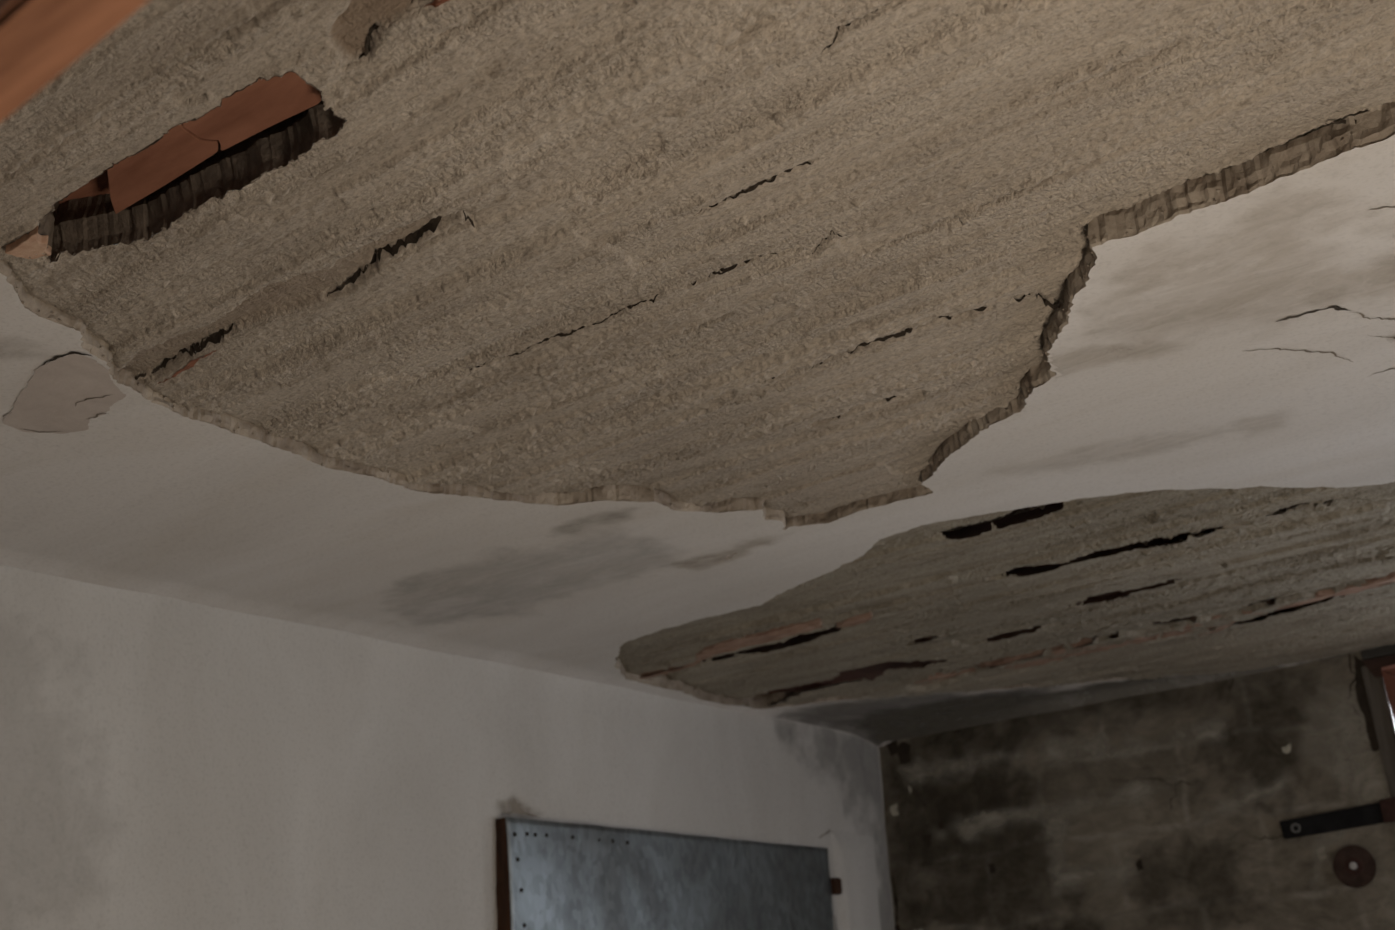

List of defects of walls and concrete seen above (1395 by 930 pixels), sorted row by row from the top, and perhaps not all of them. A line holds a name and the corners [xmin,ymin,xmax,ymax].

flaking render [0,0,1395,530]
crack [1245,305,1395,377]
crack [947,503,1052,532]
flaking render [614,482,1395,751]
leakage [801,651,1358,930]
leakage [1319,700,1388,802]